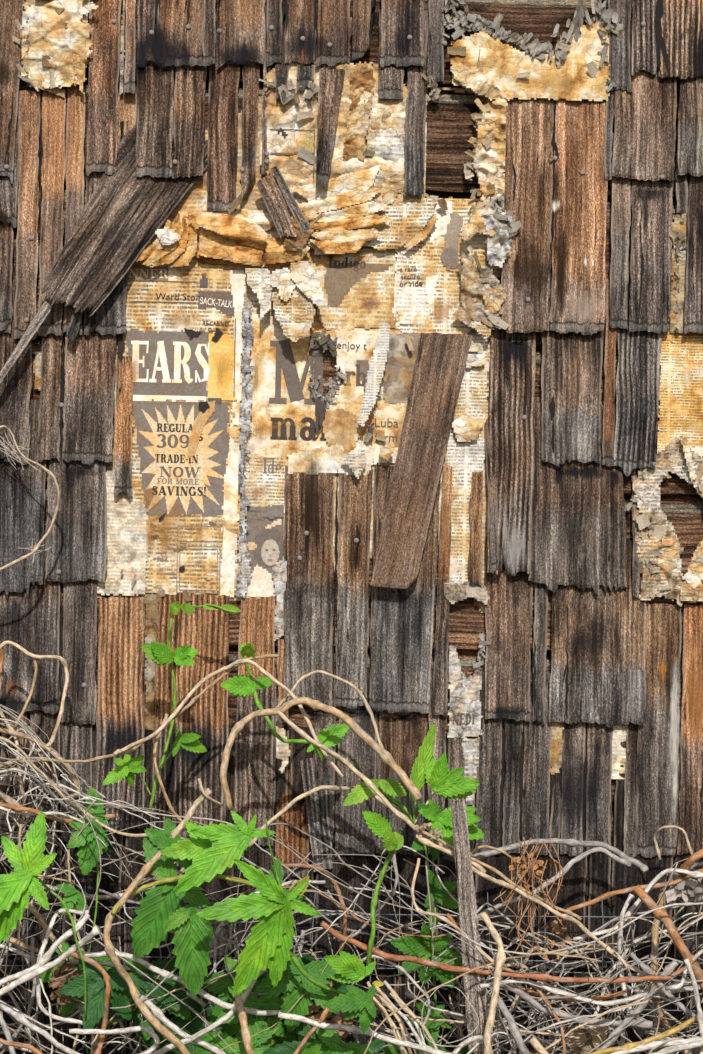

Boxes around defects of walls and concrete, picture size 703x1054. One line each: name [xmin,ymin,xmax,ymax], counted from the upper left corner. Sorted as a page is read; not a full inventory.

leakage [135,28,189,81]
leakage [218,31,259,66]